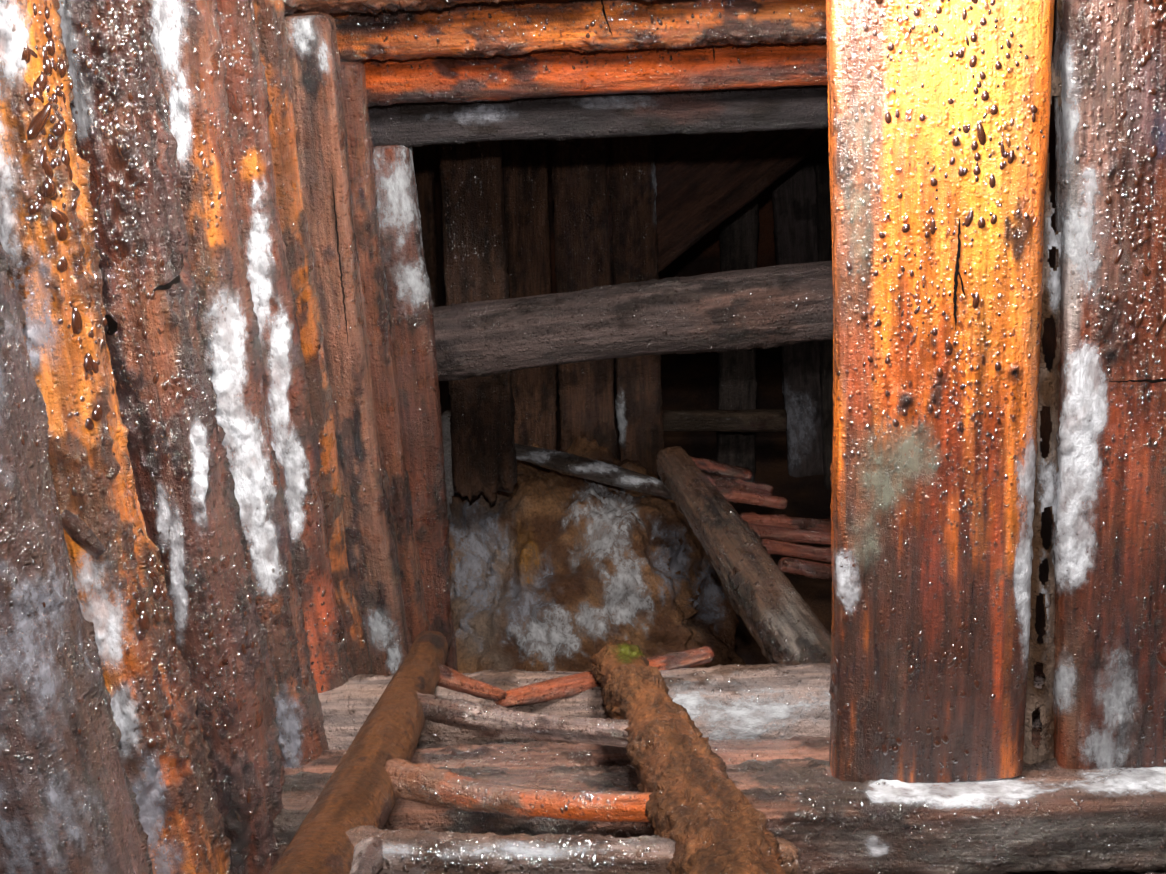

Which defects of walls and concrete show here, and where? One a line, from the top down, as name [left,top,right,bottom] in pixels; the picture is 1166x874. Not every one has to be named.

damp [0,1,28,76]
damp [151,0,191,159]
damp [374,146,422,244]
crack [953,218,965,330]
damp [1048,169,1098,306]
damp [80,560,122,660]
damp [158,496,187,626]
damp [191,426,208,501]
damp [209,225,306,594]
damp [1014,345,1106,657]
mould [1080,656,1166,793]
mould [868,778,1053,808]